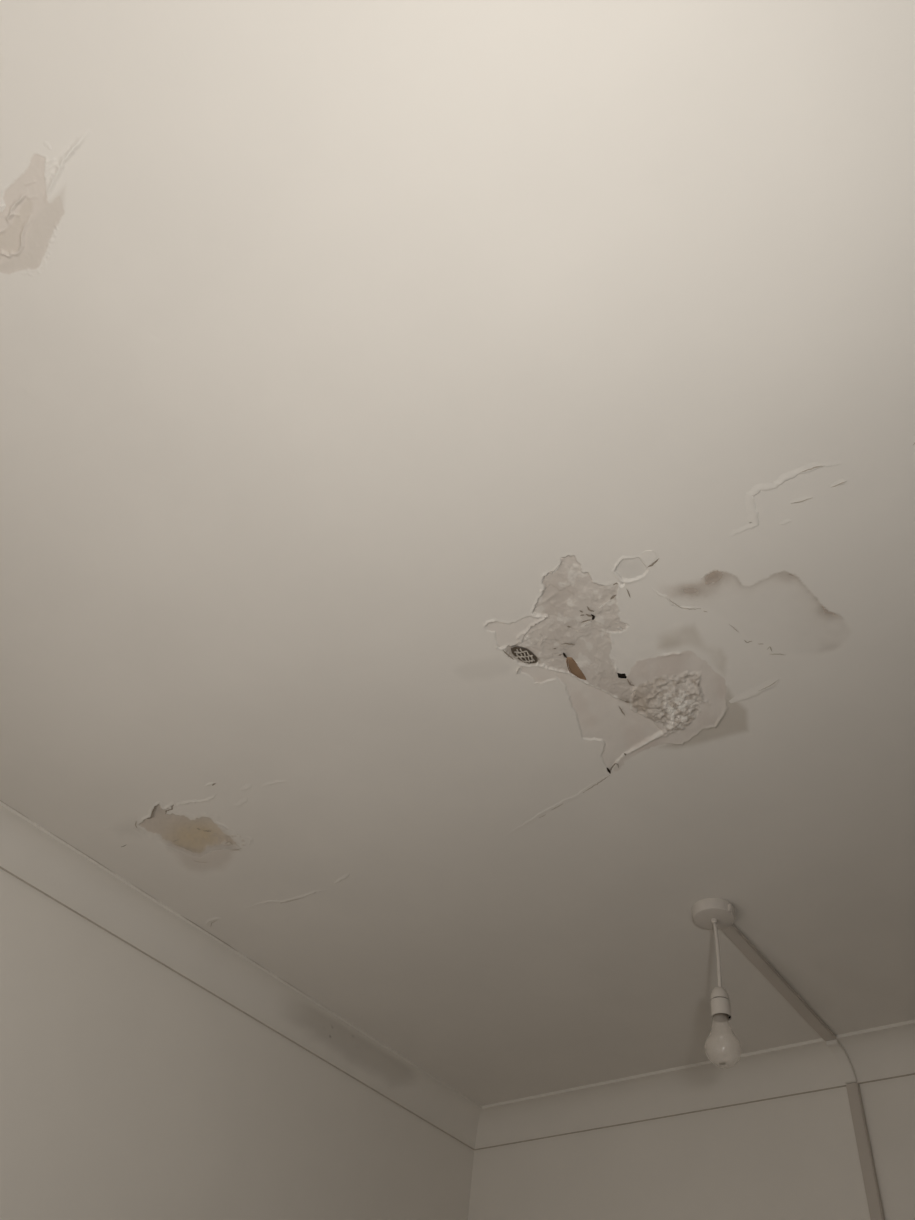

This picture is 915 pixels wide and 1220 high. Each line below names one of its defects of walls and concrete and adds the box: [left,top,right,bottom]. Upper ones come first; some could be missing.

peeling [0,127,94,283]
crack [728,461,847,537]
flaking render [481,551,752,778]
peeling [133,782,254,863]